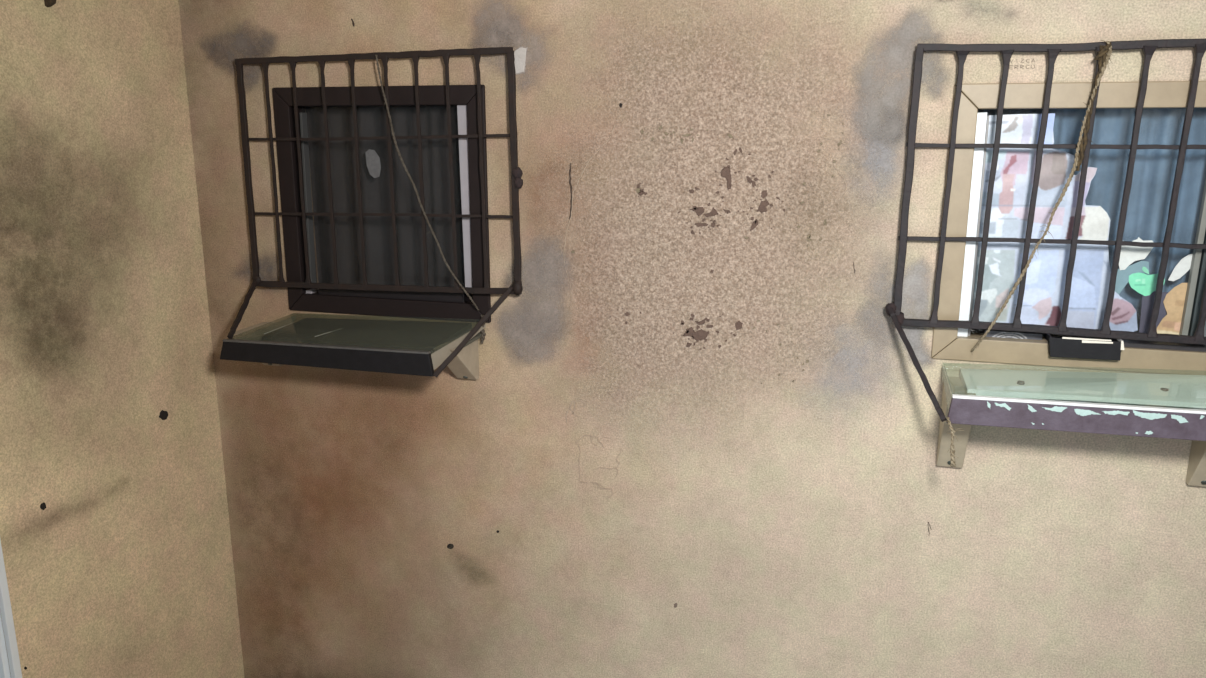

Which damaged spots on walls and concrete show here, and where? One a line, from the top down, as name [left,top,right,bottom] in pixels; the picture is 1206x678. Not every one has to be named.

peeling [564,36,849,395]